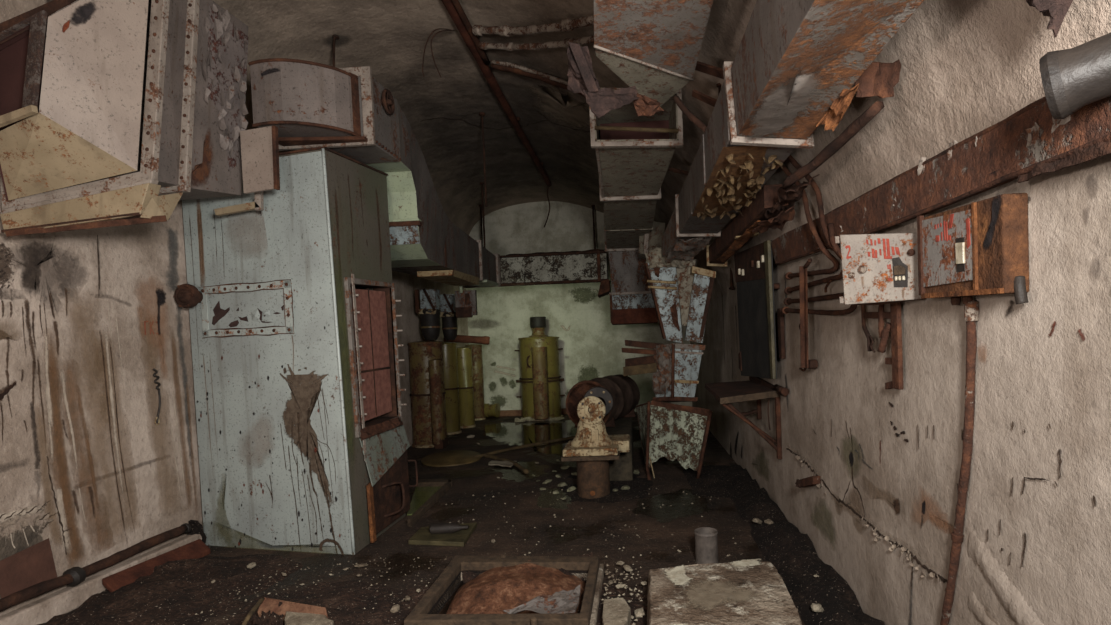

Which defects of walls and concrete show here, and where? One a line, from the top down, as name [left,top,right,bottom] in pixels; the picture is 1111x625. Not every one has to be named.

damp [0,243,68,469]
damp [101,302,132,527]
damp [156,229,178,335]
damp [171,306,196,497]
crack [827,482,866,521]